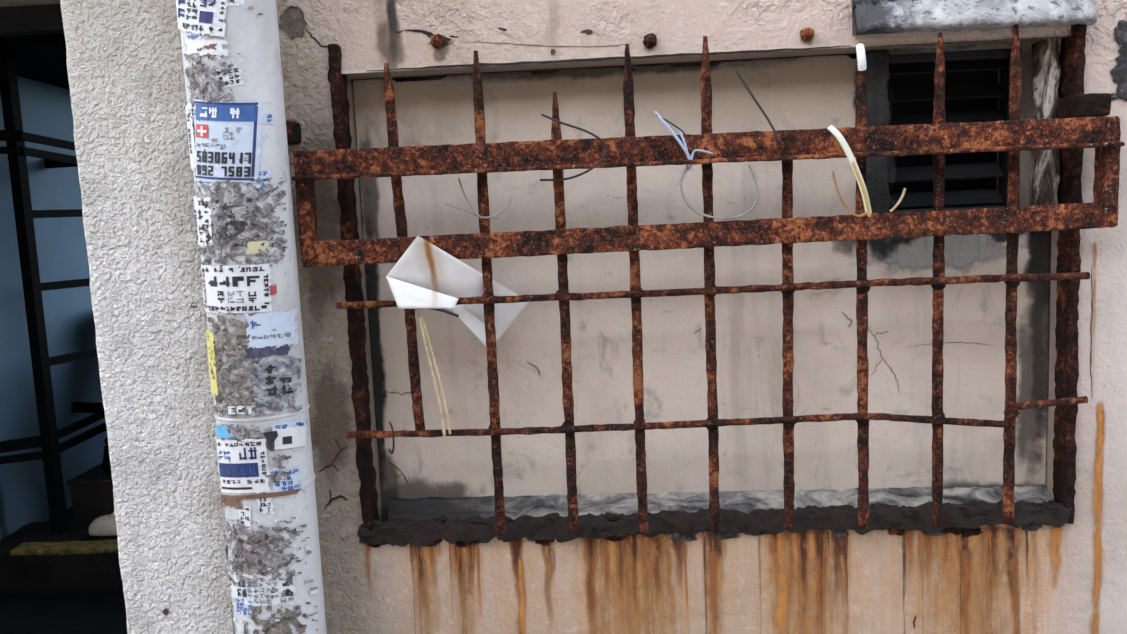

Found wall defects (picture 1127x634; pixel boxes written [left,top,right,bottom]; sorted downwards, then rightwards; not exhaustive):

damp [386,0,397,59]
corrosion [410,543,480,634]
corrosion [510,538,525,634]
corrosion [542,542,555,588]
corrosion [584,534,688,634]
corrosion [702,532,726,634]
corrosion [758,530,848,634]
corrosion [902,526,1062,634]
corrosion [1090,403,1105,634]